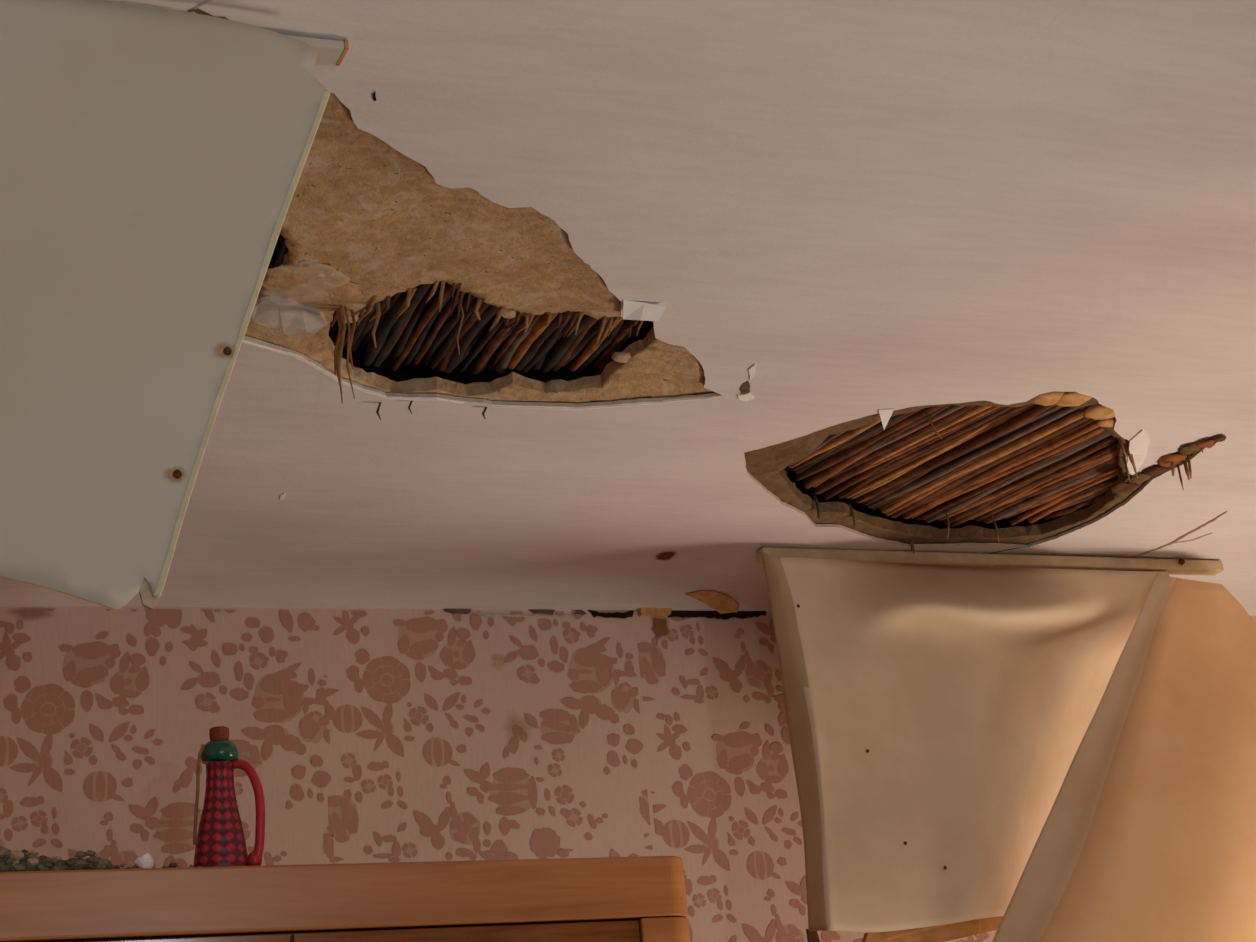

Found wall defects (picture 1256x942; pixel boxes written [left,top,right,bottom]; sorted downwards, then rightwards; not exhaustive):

crack [102,0,229,20]
spalling [242,92,716,420]
spalling [744,391,1227,554]
crack [444,590,766,620]